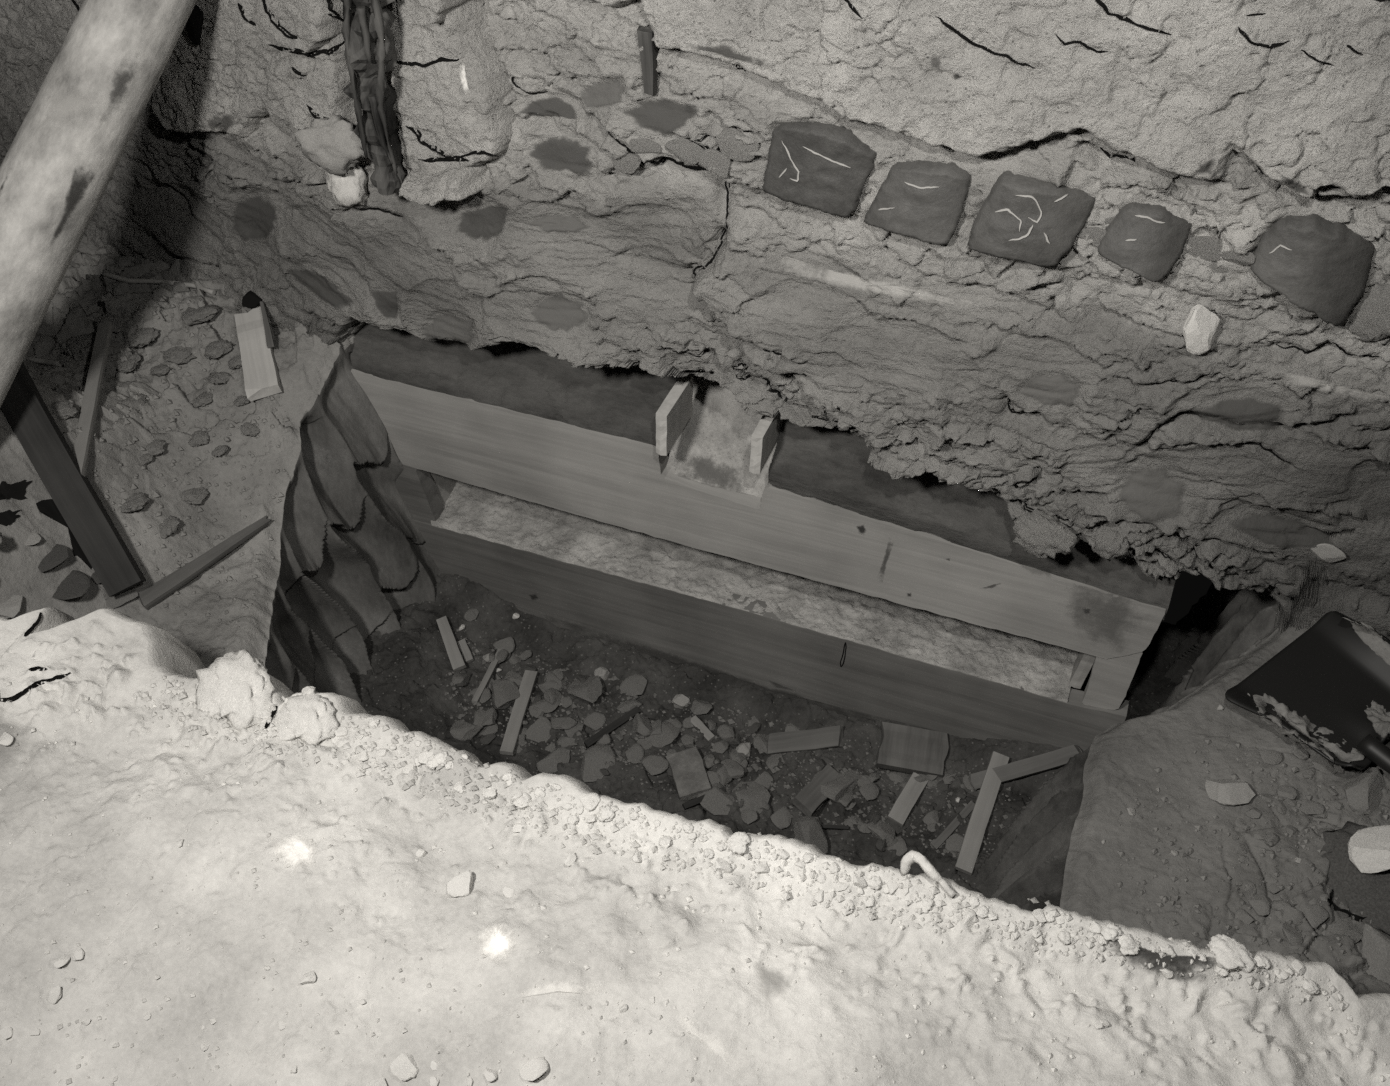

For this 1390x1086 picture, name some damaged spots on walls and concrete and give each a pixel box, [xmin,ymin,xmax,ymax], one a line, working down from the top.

crack [1095,0,1172,35]
crack [935,16,1034,68]
crack [1055,34,1109,53]
crack [1238,13,1363,66]
crack [406,126,499,162]
crack [1100,147,1136,162]
crack [597,111,761,276]
crack [357,208,403,217]
crack [672,348,831,421]